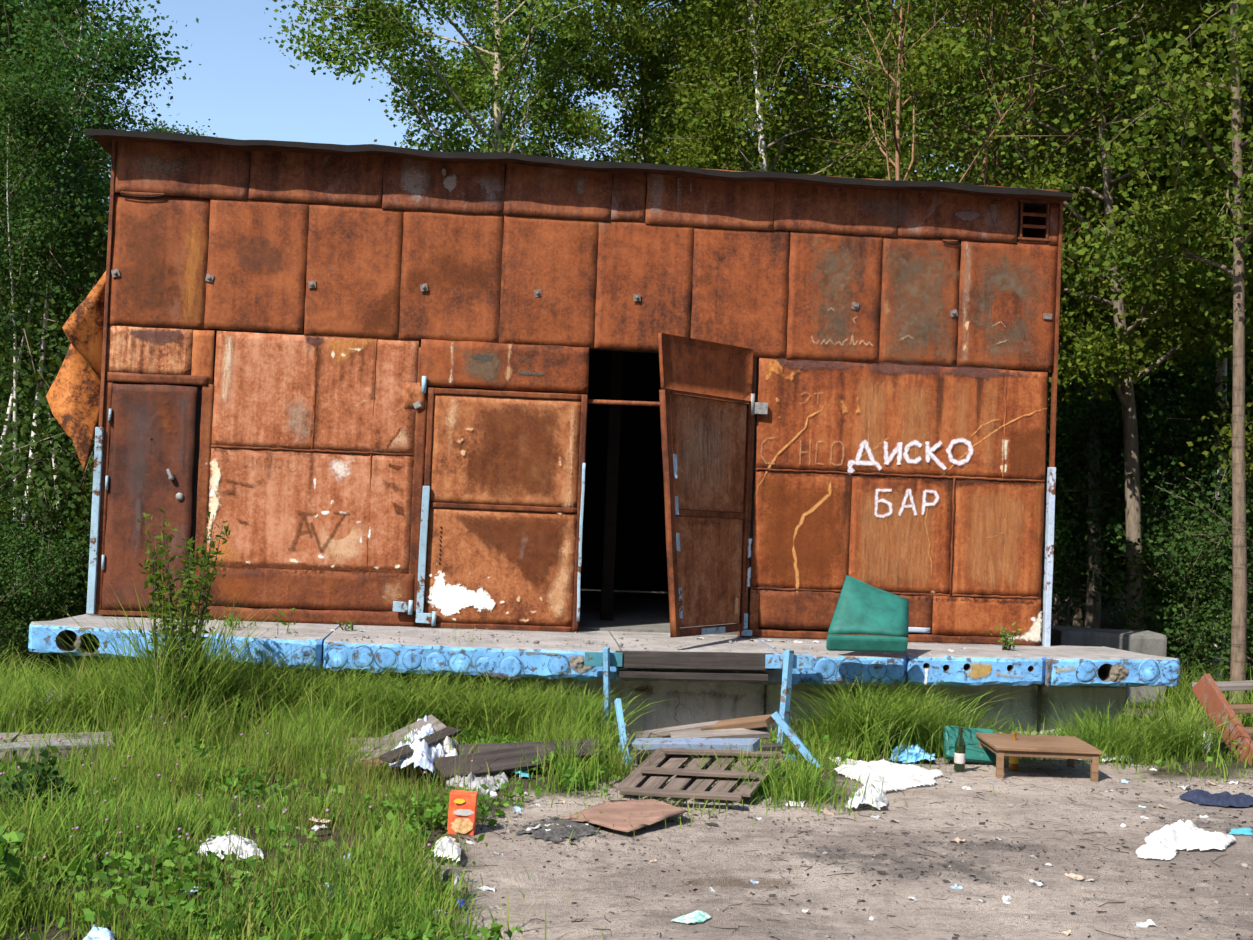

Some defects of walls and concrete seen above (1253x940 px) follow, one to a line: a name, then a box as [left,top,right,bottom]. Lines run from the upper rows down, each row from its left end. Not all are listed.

corrosion [294,336,375,485]
corrosion [774,358,1035,423]
corrosion [465,404,559,498]
peeling [207,461,221,538]
corrosion [210,542,407,599]
peeling [427,571,520,620]
corrosion [460,514,566,586]
peeling [521,540,570,622]
corrosion [757,429,1041,597]